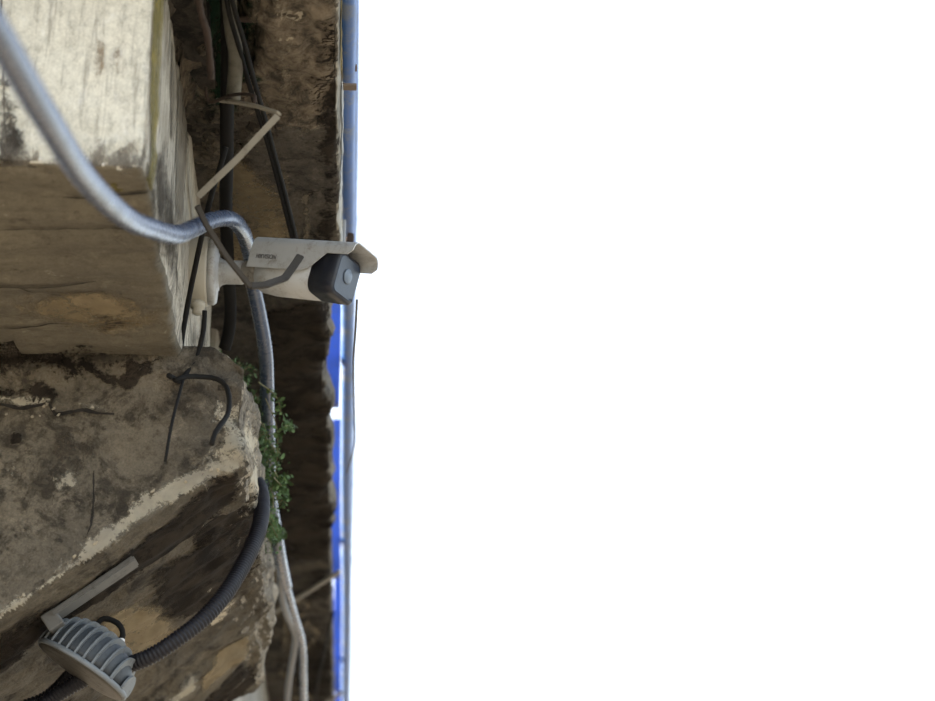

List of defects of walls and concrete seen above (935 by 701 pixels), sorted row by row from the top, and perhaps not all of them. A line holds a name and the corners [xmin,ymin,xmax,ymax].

spalling [177,0,221,114]
spalling [237,0,338,130]
crack [2,74,14,156]
damp [0,81,59,173]
damp [90,141,145,176]
damp [152,42,188,225]
damp [158,242,178,286]
spalling [0,396,114,418]
spalling [0,422,261,619]
spalling [102,603,175,654]
spalling [210,602,235,627]
spalling [202,636,249,691]